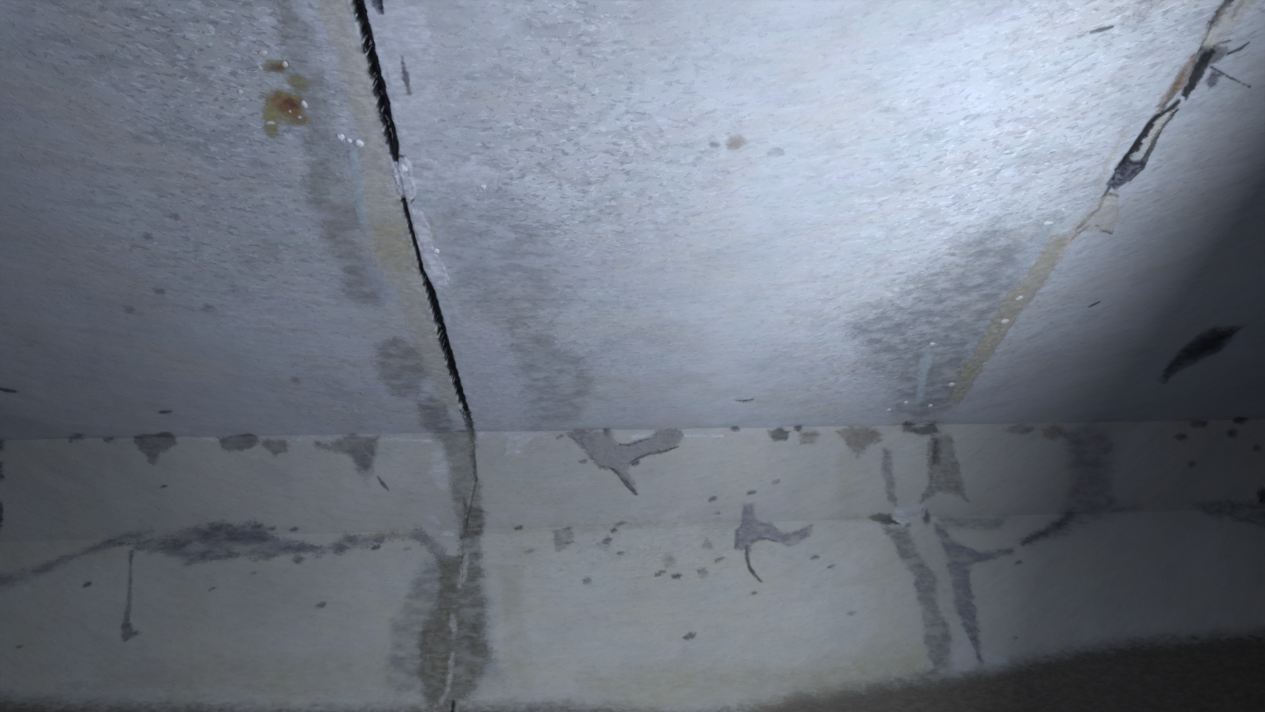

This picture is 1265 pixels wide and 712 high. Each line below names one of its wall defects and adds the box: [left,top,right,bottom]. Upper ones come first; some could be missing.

corrosion [264,80,310,135]
crack [352,0,399,162]
spalling [372,0,383,14]
crack [1075,0,1250,231]
crack [401,198,477,539]
leakage [321,0,621,712]
peeling [570,429,683,495]
peeling [737,493,807,581]
leakage [749,423,1265,712]